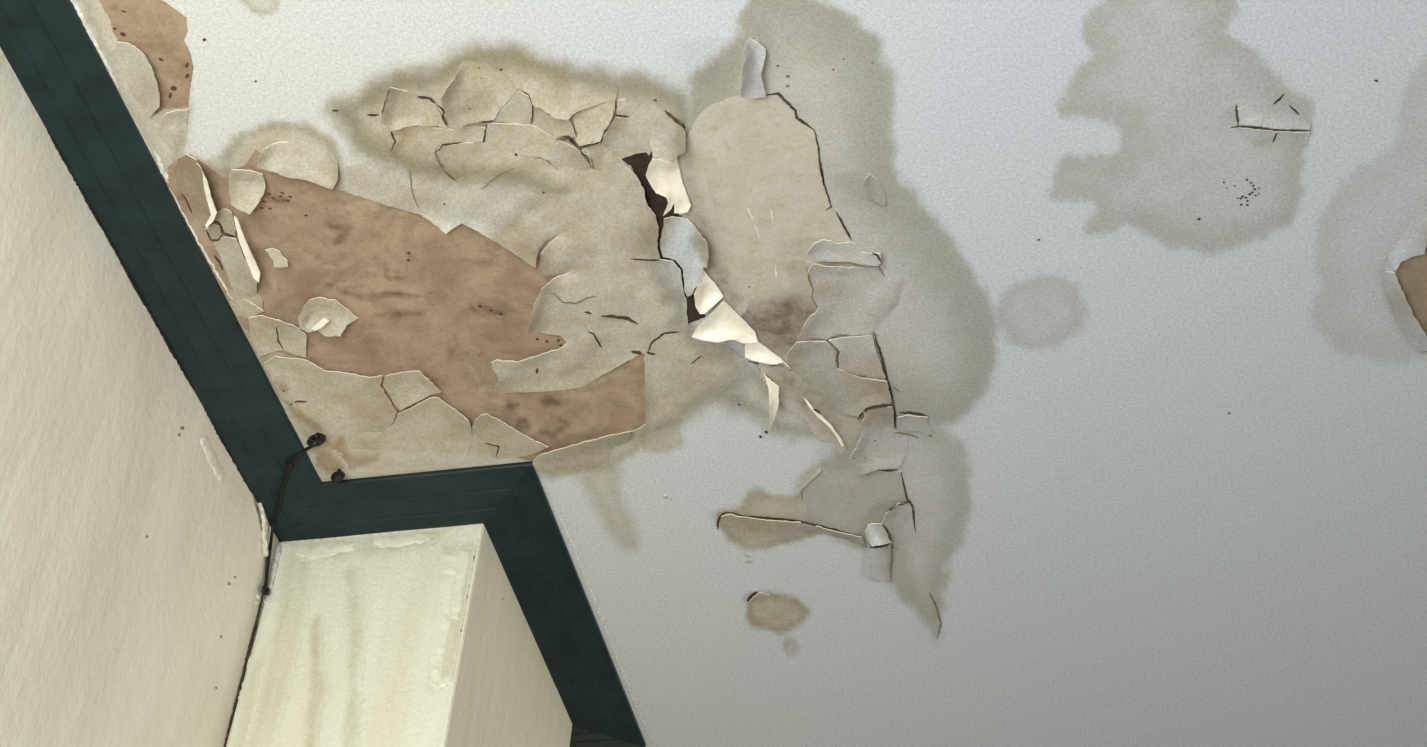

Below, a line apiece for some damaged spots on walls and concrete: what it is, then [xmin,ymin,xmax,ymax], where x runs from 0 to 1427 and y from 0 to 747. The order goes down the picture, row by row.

damp [1039,0,1427,372]
peeling [1231,93,1311,147]
peeling [100,0,933,583]
damp [75,0,1096,659]
peeling [1384,203,1427,361]
flaking render [255,503,282,604]
crack [716,512,867,550]